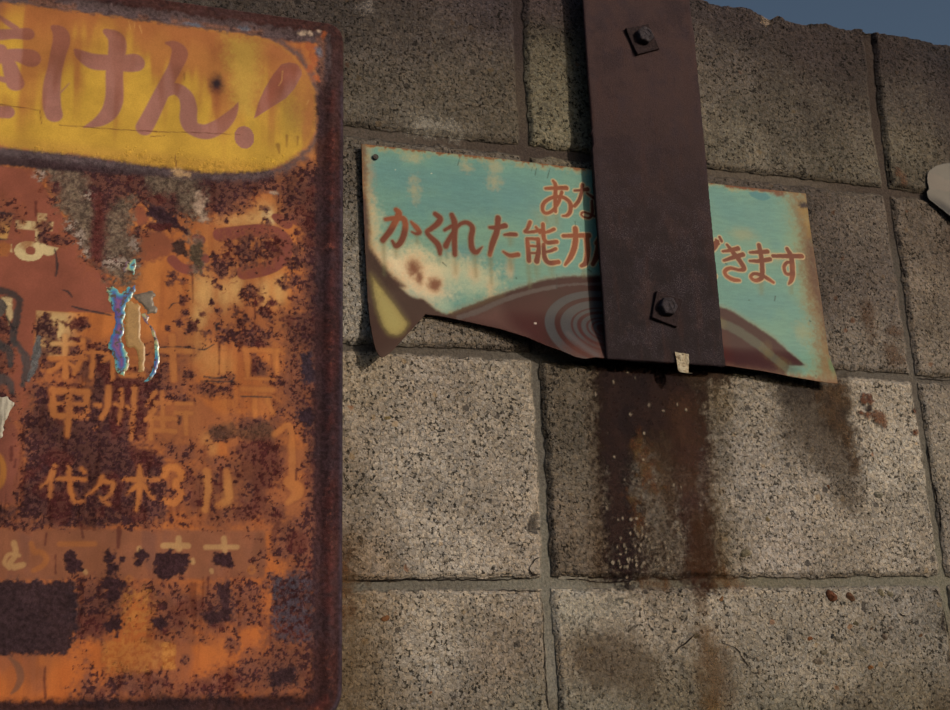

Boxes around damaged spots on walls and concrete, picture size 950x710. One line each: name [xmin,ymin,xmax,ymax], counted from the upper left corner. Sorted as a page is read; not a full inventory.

corrosion [593,358,732,596]
leakage [781,378,864,509]
corrosion [859,393,887,428]
crack [927,443,942,535]